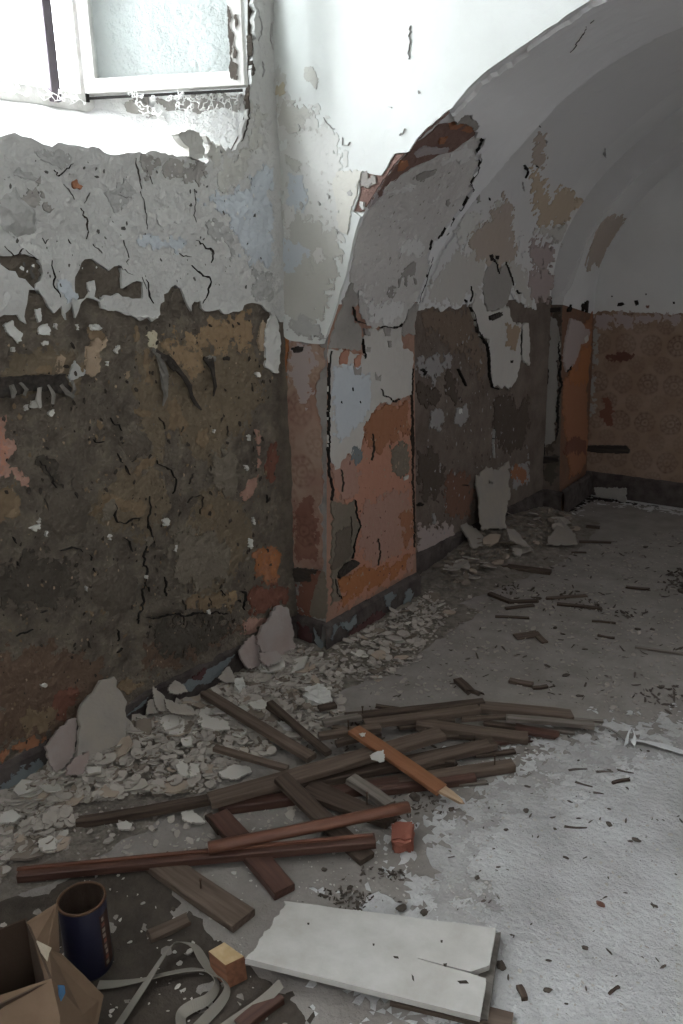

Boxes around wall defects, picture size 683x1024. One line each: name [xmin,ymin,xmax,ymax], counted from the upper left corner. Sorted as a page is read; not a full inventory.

flaking render [123,100,208,187]
flaking render [7,167,55,213]
flaking render [0,242,41,288]
flaking render [75,259,158,319]
peeling [2,320,23,344]
peeling [34,308,51,335]
peeling [67,324,108,382]